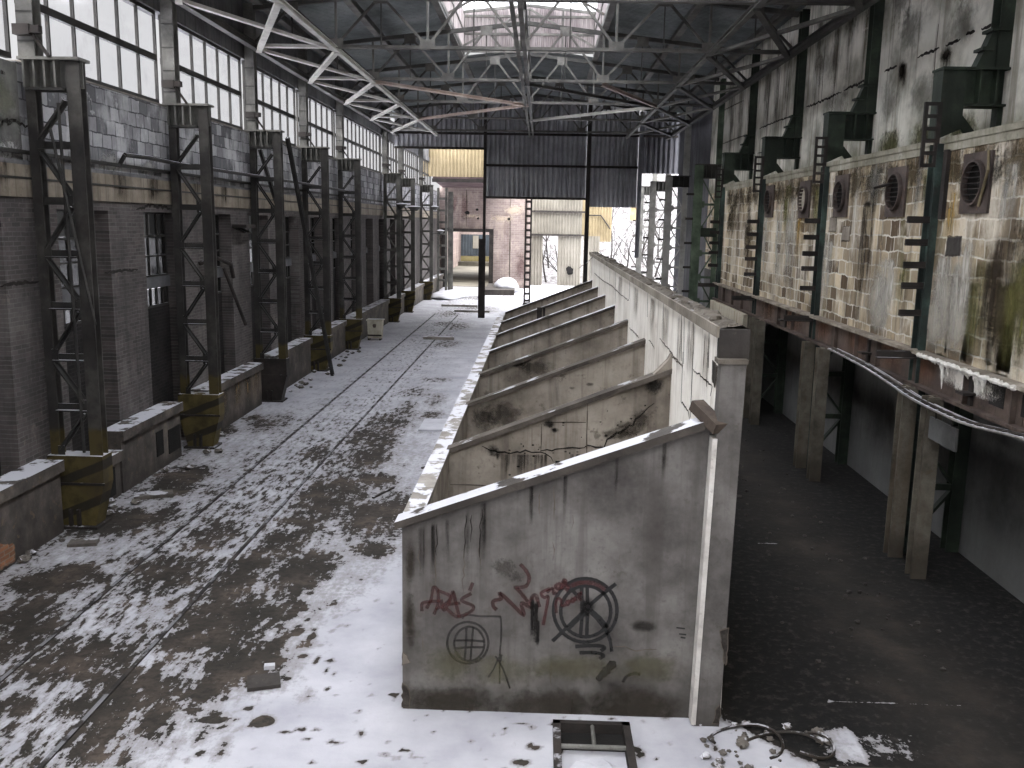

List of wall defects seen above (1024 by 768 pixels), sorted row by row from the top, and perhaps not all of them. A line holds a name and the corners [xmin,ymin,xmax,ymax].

water stain [727,187,797,267]
water stain [935,240,1024,346]
crack [595,274,712,420]
crack [482,403,654,461]
water stain [423,526,435,559]